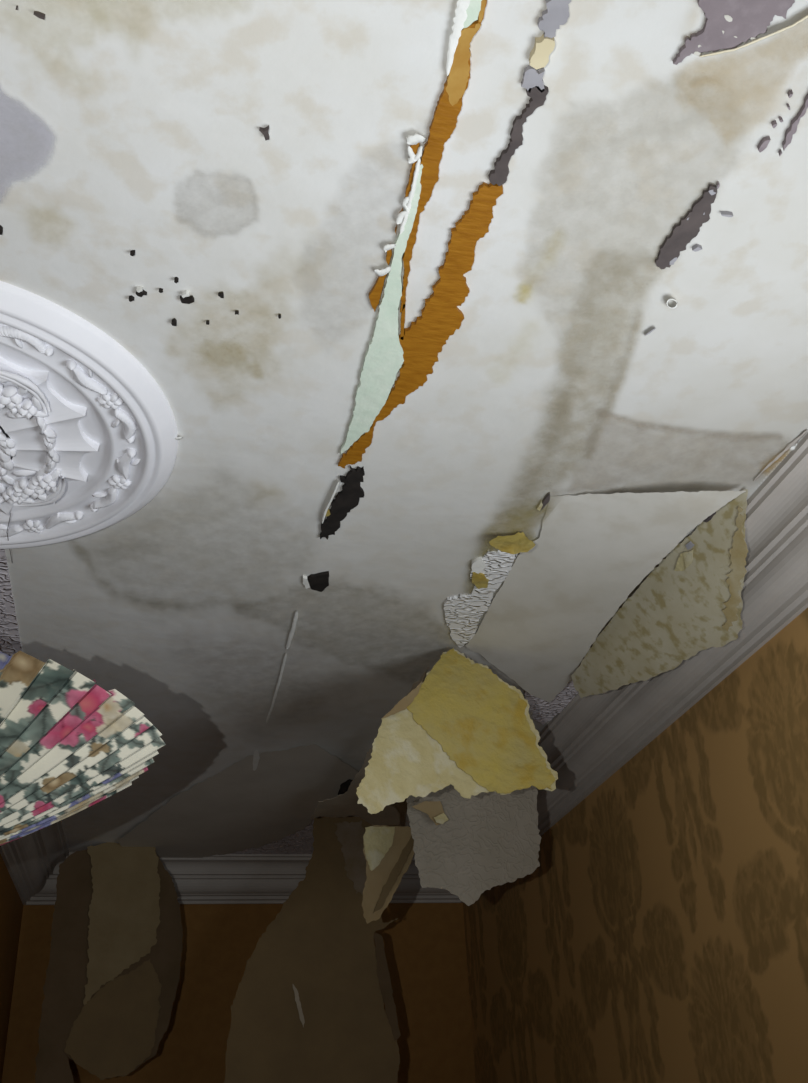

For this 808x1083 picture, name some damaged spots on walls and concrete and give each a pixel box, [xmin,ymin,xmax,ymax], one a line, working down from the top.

peeling [672,0,808,65]
peeling [757,90,808,156]
spalling [129,286,163,302]
spalling [174,277,194,304]